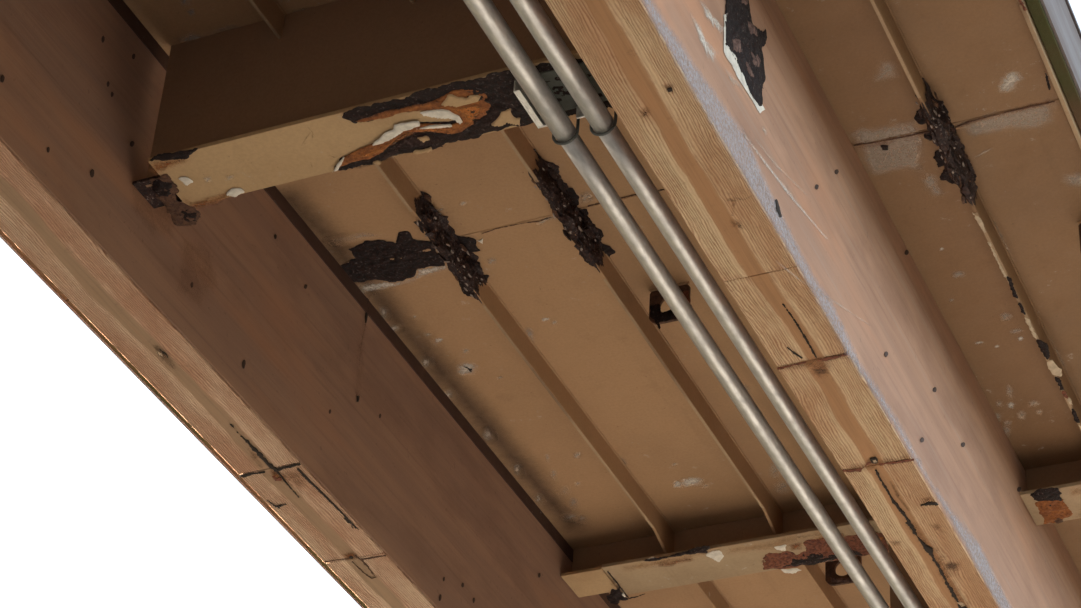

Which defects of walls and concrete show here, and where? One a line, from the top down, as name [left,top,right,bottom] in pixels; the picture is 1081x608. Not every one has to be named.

corrosion [332,70,534,172]
corrosion [535,63,577,116]
peeling [226,177,244,197]
peeling [341,231,445,290]
peeling [645,0,924,468]
crack [777,304,849,370]
crack [230,424,386,579]
corrosion [762,538,839,570]
corrosion [841,533,870,556]
crack [842,458,967,608]
peeling [920,485,1010,608]
corrosion [1030,487,1073,524]